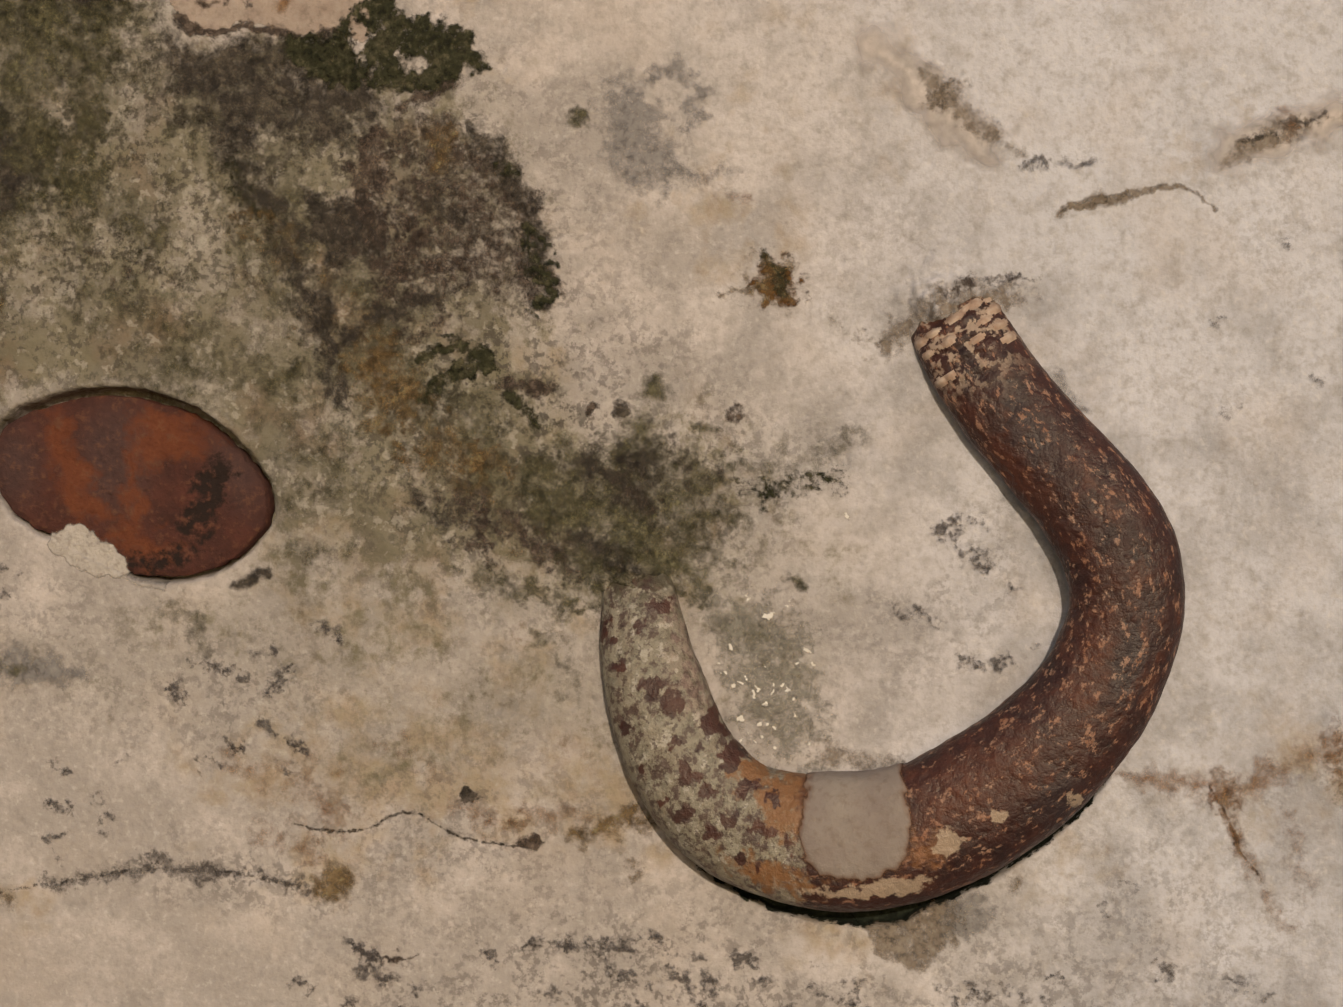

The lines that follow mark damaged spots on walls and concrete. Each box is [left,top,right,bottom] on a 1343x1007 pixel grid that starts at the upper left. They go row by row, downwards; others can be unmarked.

damp [570,108,588,126]
damp [608,60,707,194]
damp [164,35,426,398]
damp [466,122,553,310]
crack [1056,184,1216,218]
damp [412,483,582,598]
corrosion [1131,763,1286,799]
crack [294,786,545,851]
corrosion [568,803,657,850]
crack [0,850,353,903]